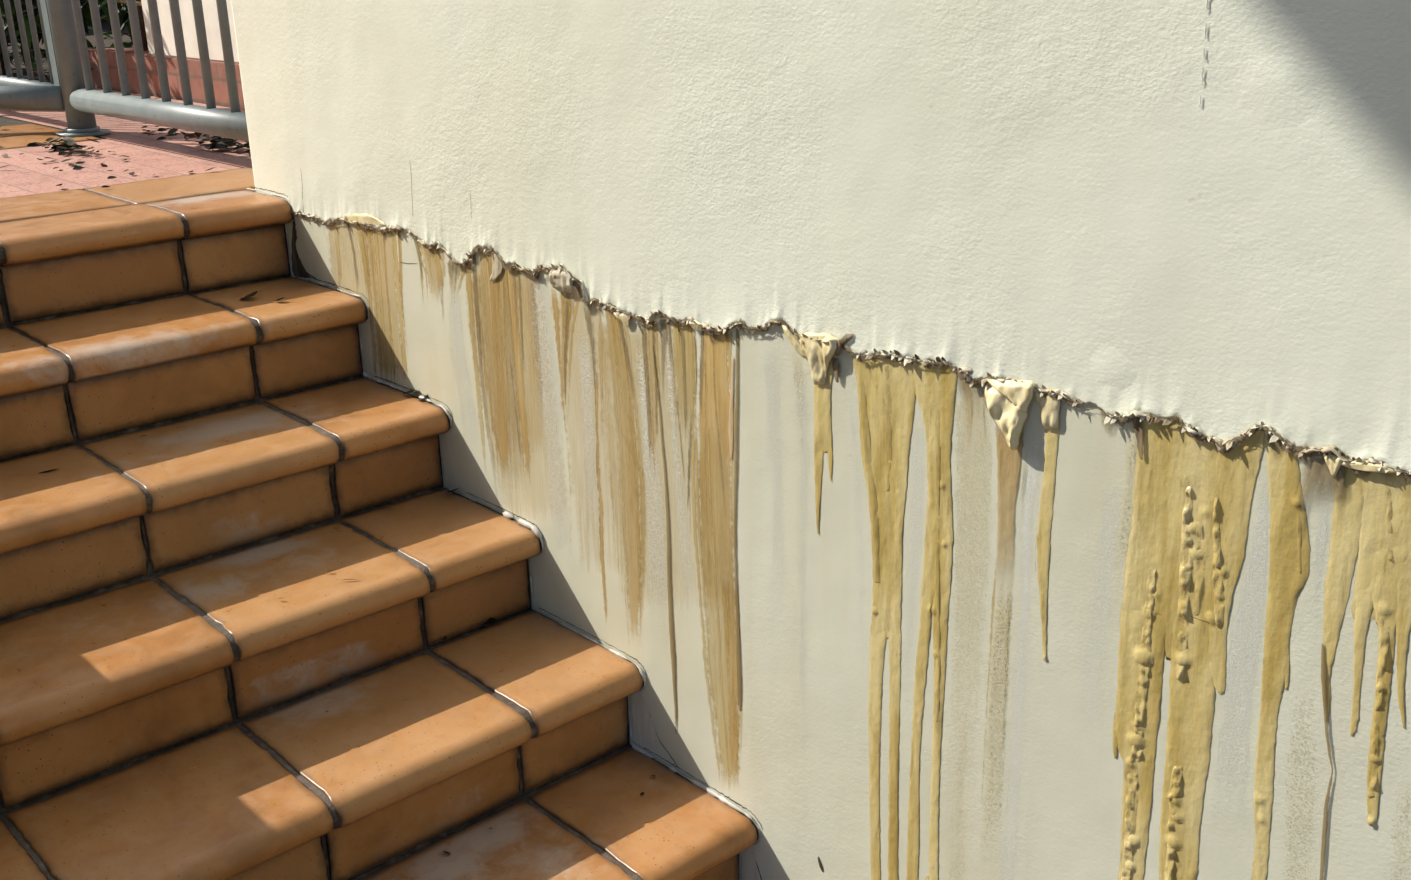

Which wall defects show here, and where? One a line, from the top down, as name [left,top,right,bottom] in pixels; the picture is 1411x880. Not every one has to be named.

spalling [442,429,469,493]
water stain [526,278,572,571]
water stain [576,332,617,534]
water stain [636,328,695,644]
peeling [291,210,1083,450]
water stain [762,345,1061,880]
water stain [1074,414,1411,880]
peeling [1101,409,1411,490]